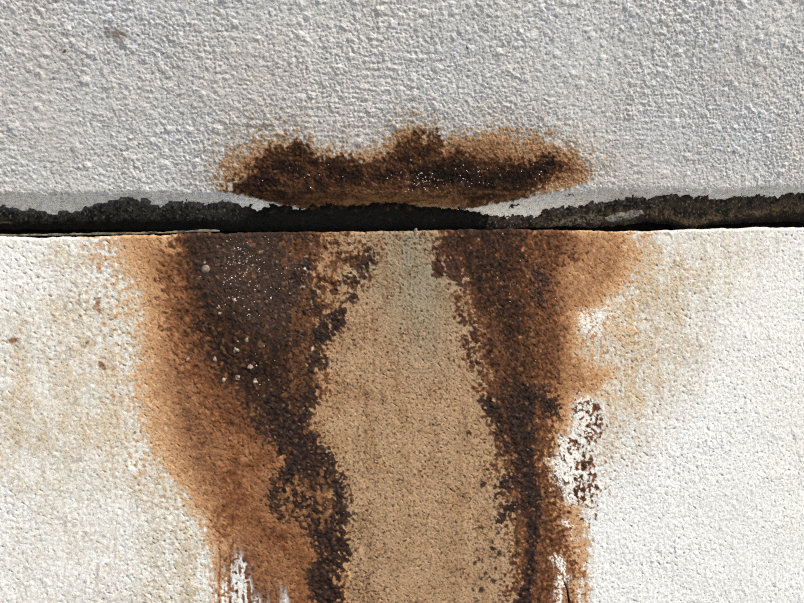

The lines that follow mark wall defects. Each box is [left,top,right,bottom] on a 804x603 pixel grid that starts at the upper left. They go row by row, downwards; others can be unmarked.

corrosion [206,111,598,210]
corrosion [87,228,662,603]
peeling [550,394,602,520]